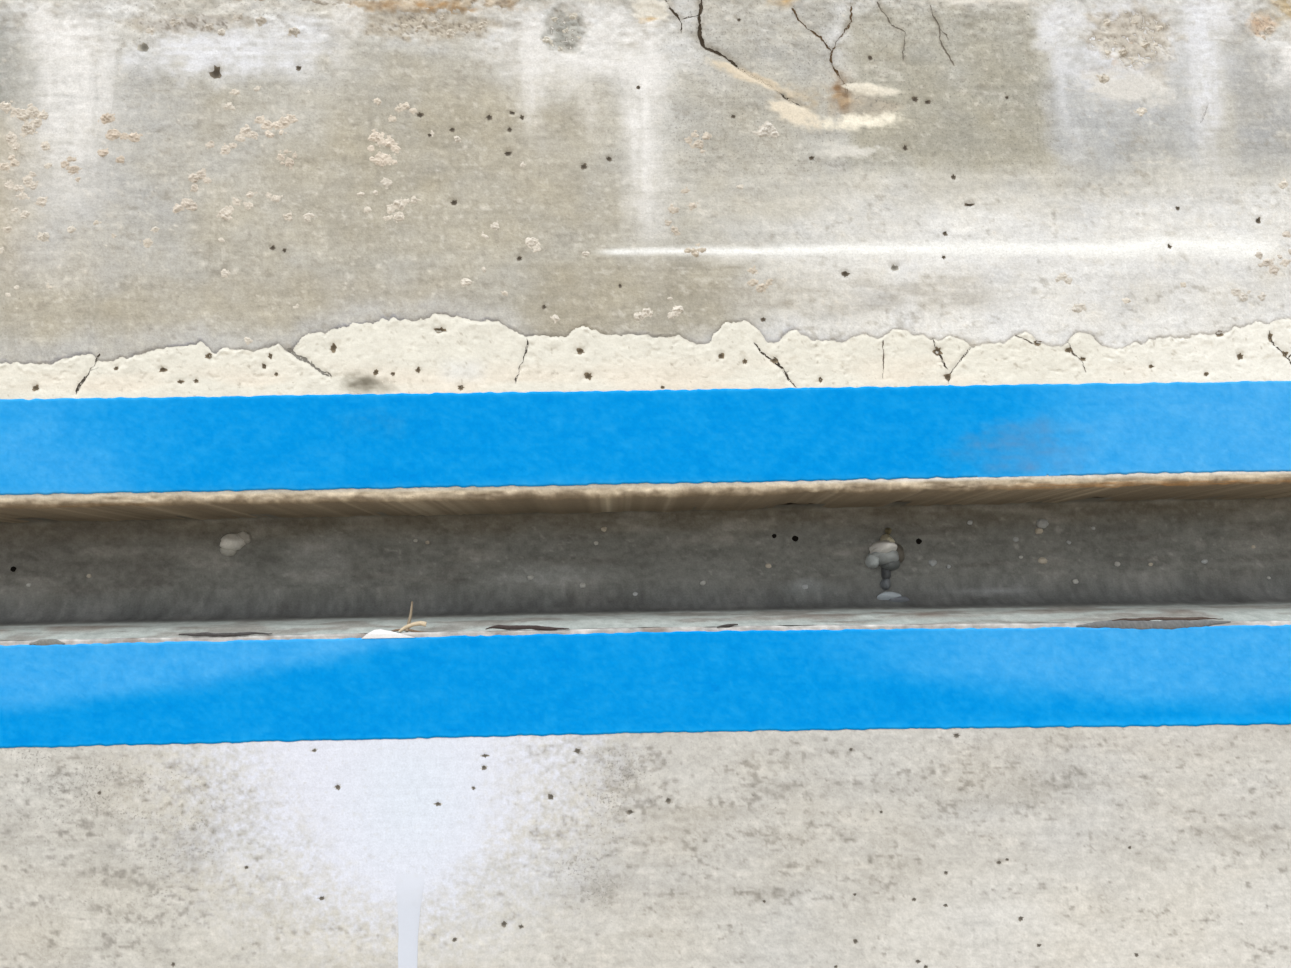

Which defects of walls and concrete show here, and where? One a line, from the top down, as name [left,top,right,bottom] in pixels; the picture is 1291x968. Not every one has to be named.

spalling [626,0,675,22]
crack [665,0,800,106]
corrosion [750,66,869,116]
crack [792,2,906,92]
crack [930,5,954,65]
spalling [911,0,1055,12]
leakage [0,0,374,271]
spalling [0,313,1291,400]